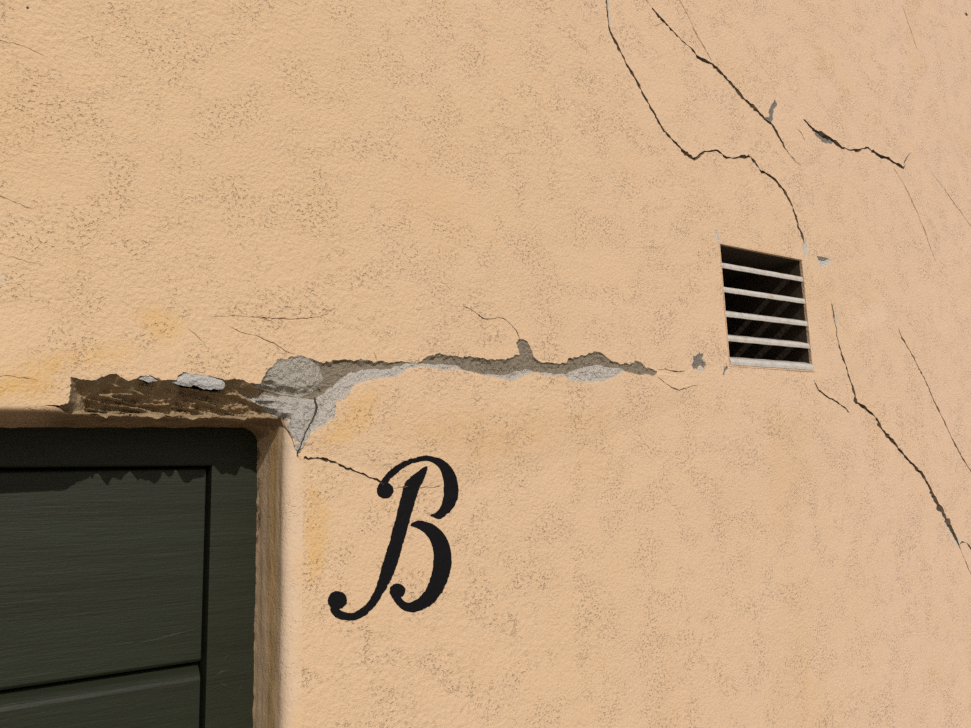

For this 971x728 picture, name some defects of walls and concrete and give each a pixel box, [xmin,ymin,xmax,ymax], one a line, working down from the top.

crack [606,0,804,242]
crack [646,0,936,261]
spalling [58,339,657,452]
crack [297,397,440,488]
crack [814,303,971,573]